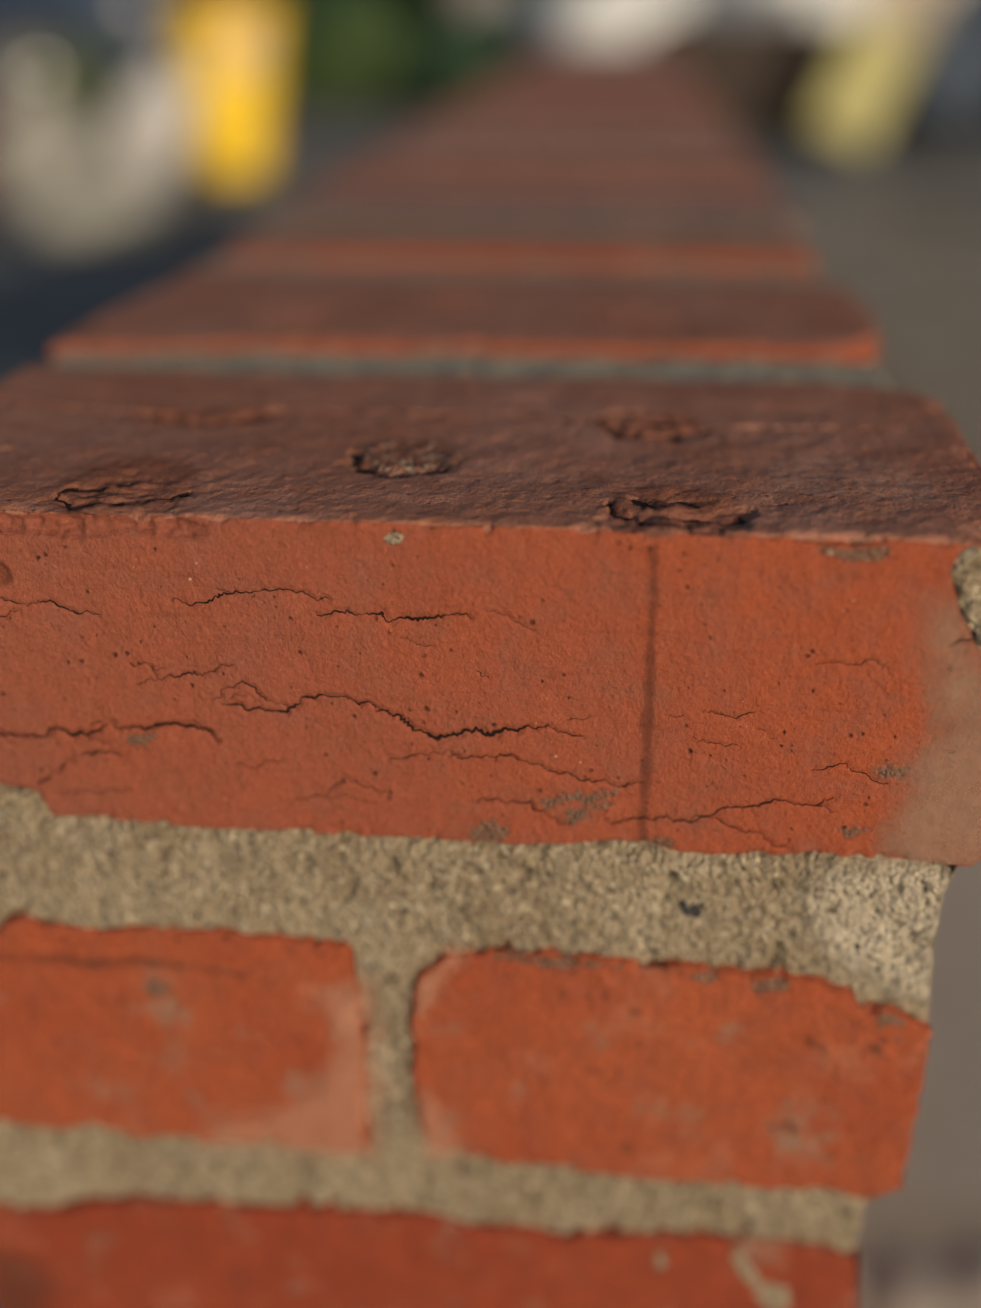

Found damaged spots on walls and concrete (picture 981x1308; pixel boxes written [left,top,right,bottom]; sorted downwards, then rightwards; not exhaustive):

crack [0,597,100,648]
crack [173,588,532,647]
crack [0,662,641,804]
crack [670,710,775,747]
crack [471,798,573,826]
crack [603,762,889,848]